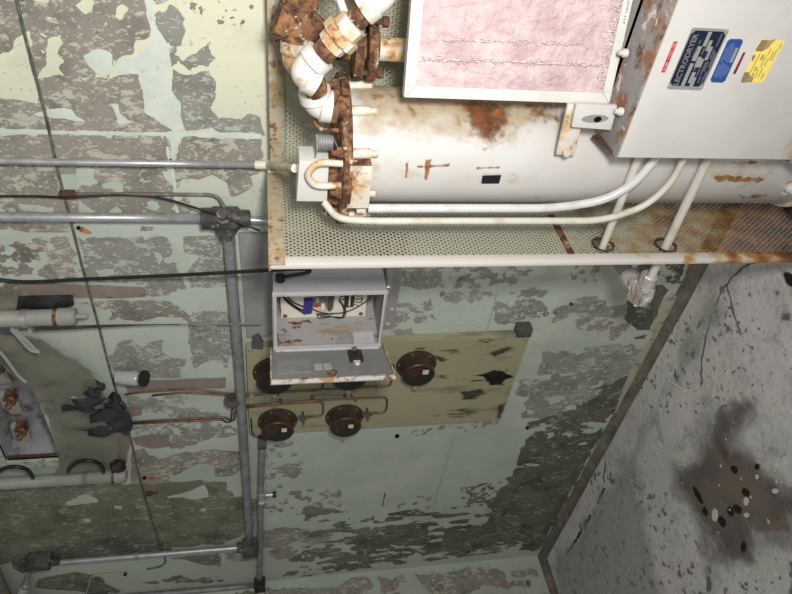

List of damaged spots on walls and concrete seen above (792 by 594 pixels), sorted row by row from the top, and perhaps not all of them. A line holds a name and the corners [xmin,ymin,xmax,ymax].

peeling [0,0,265,213]
peeling [0,222,233,379]
peeling [0,264,685,594]
leakage [674,404,792,563]